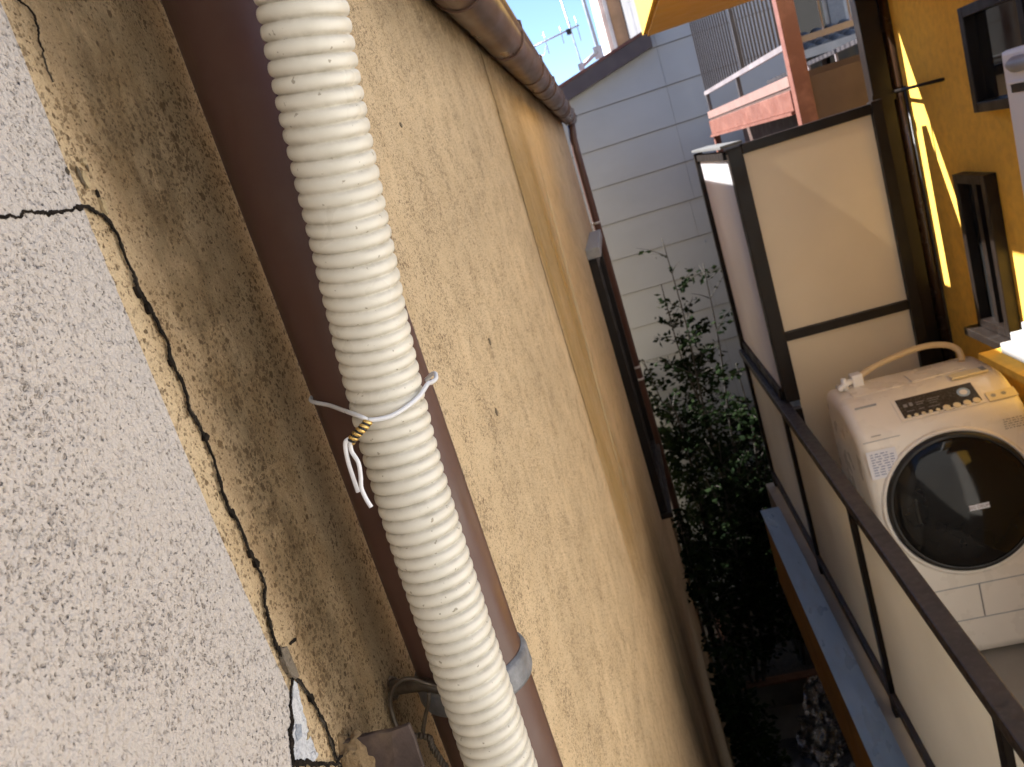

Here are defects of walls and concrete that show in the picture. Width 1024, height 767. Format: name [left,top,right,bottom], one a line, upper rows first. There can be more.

crack [17,0,54,82]
crack [0,204,343,767]
flaking render [291,681,318,762]